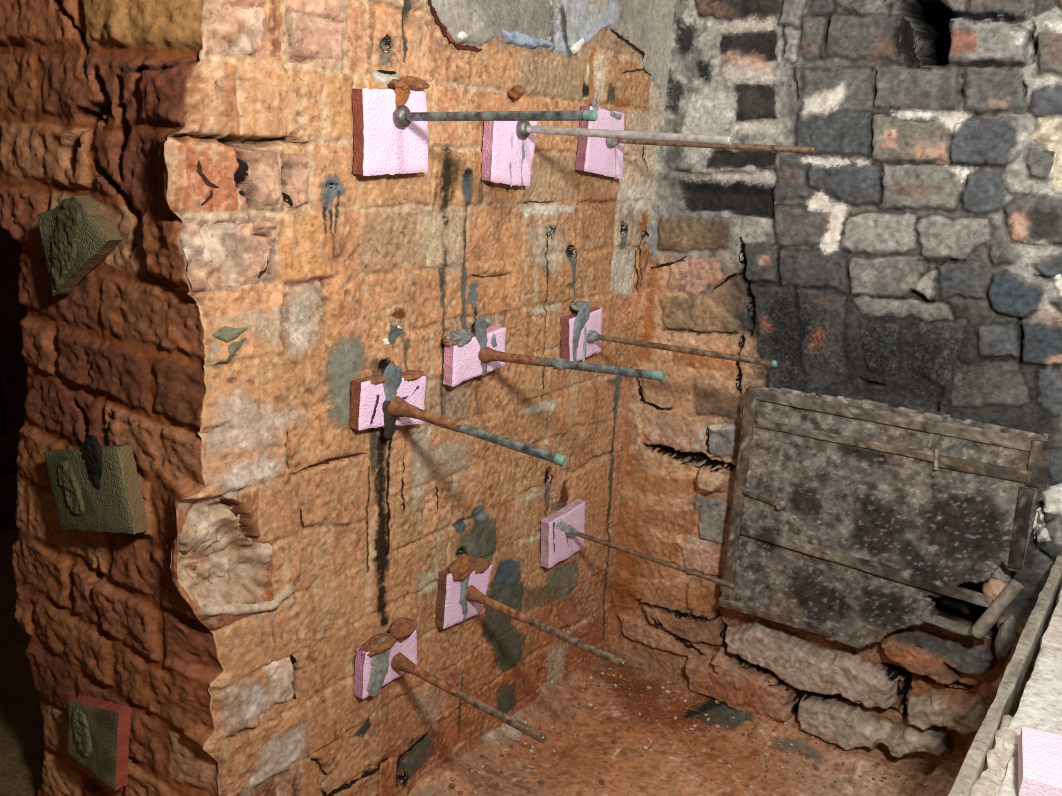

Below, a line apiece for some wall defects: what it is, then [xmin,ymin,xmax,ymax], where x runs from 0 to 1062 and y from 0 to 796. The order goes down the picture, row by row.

spalling [199,5,265,59]
spalling [287,0,345,61]
flaking render [427,0,676,112]
spalling [233,142,309,209]
spalling [180,220,281,293]
crack [637,378,671,410]
crack [648,428,736,472]
spalling [170,496,295,616]
damp [366,427,392,626]
crack [292,757,390,796]